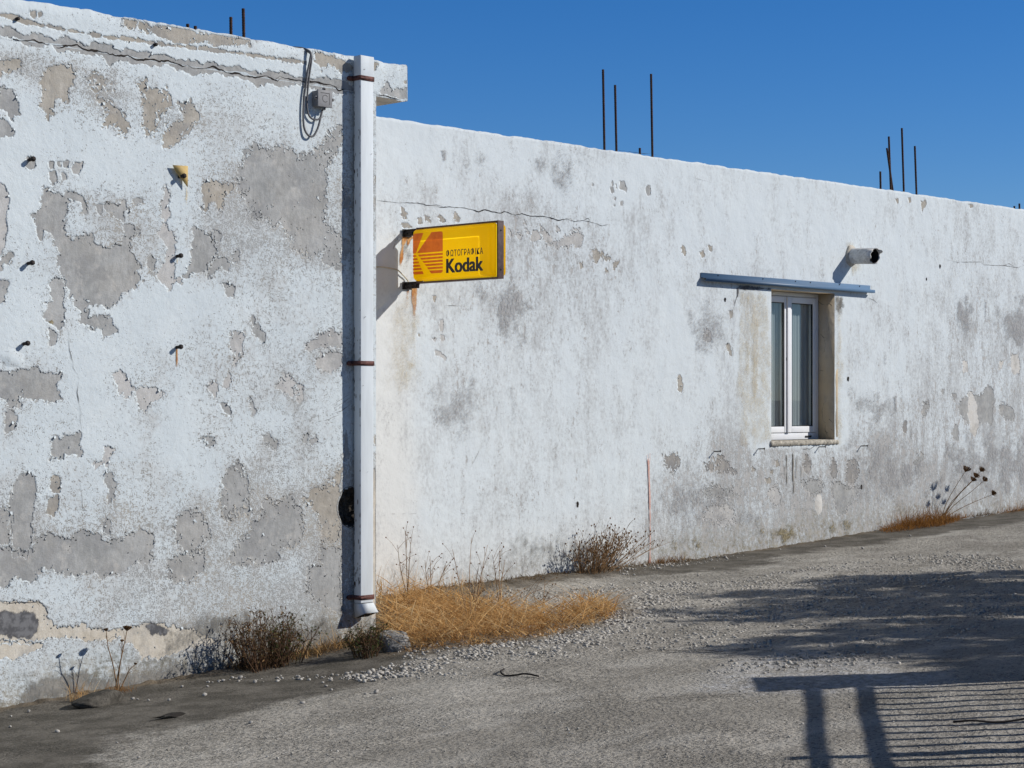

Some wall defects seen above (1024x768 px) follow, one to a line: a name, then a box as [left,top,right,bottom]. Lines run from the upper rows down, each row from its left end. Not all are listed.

crack [1,35,345,91]
peeling [0,8,354,151]
peeling [0,181,16,306]
peeling [24,123,352,349]
corrosion [400,237,413,264]
crack [386,201,608,226]
corrosion [408,288,417,314]
peeling [0,364,64,436]
peeling [204,314,267,418]
peeling [303,325,344,375]
leakage [925,430,1024,498]
peeling [0,430,354,663]